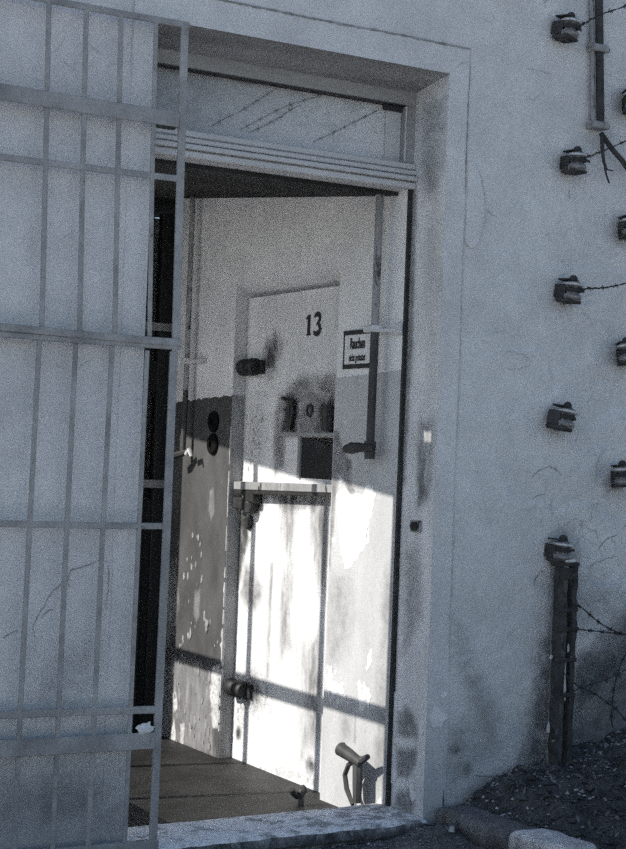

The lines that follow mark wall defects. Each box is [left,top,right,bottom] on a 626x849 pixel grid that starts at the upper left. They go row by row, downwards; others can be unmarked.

crack [220,0,471,193]
crack [449,213,466,655]
crack [3,561,110,638]
peeling [183,532,203,583]
peeling [162,558,227,751]
water stain [280,495,326,582]
peeling [324,665,348,705]
peeling [329,431,376,569]
peeling [357,680,371,713]
water stain [572,620,626,745]